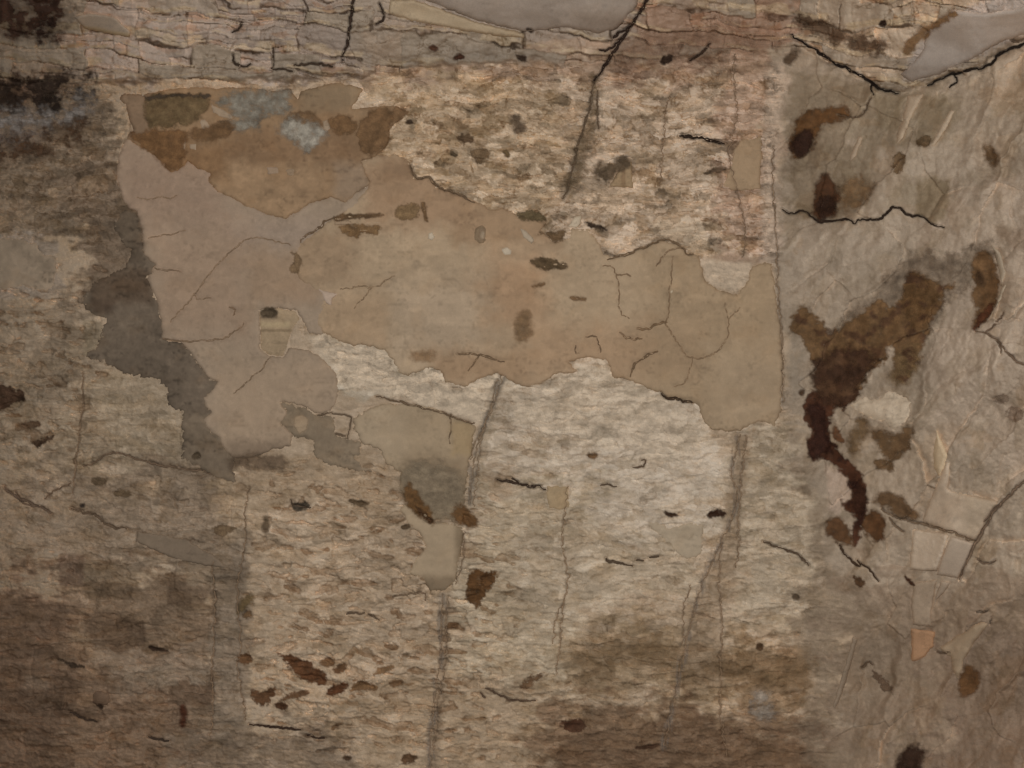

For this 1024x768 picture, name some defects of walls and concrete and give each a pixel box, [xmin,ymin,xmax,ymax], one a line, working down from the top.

water stain [0,89,89,144]
peeling [200,105,232,129]
crack [562,0,648,199]
rust [789,106,850,159]
crack [791,34,899,119]
crack [927,43,1024,88]
rust [812,173,841,221]
crack [771,145,945,402]
spalling [259,308,299,356]
rust [803,389,886,546]
rust [404,482,433,524]
rust [452,504,478,527]